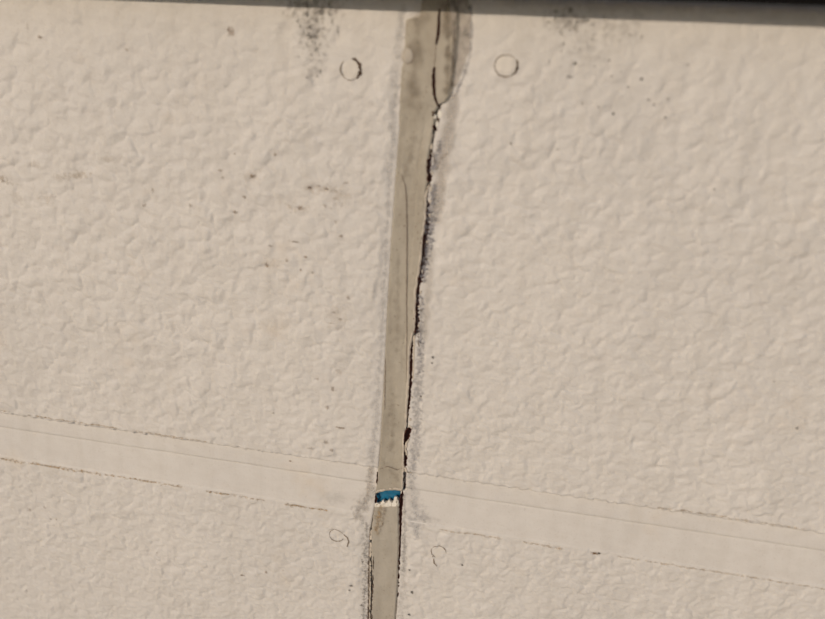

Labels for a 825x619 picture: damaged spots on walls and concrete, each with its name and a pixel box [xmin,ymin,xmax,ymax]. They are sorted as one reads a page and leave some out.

crack [340,58,362,81]
crack [374,8,448,619]
peeling [375,496,397,507]
crack [366,528,374,619]